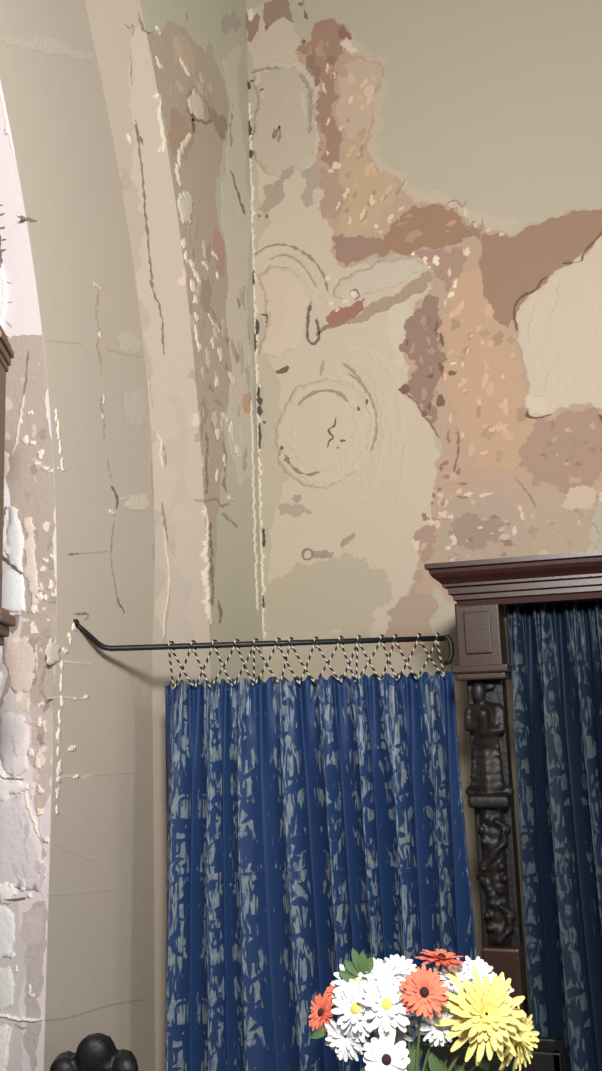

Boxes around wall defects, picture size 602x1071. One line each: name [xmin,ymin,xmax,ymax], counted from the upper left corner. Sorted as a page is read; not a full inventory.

crack [0,204,37,394]
crack [135,119,165,355]
flaking render [180,0,302,485]
crack [255,243,378,476]
crack [405,393,460,472]
peeling [294,18,602,605]
crack [513,232,602,331]
flaking render [0,334,56,892]
peeling [0,1024,9,1071]
peeling [0,906,18,1012]